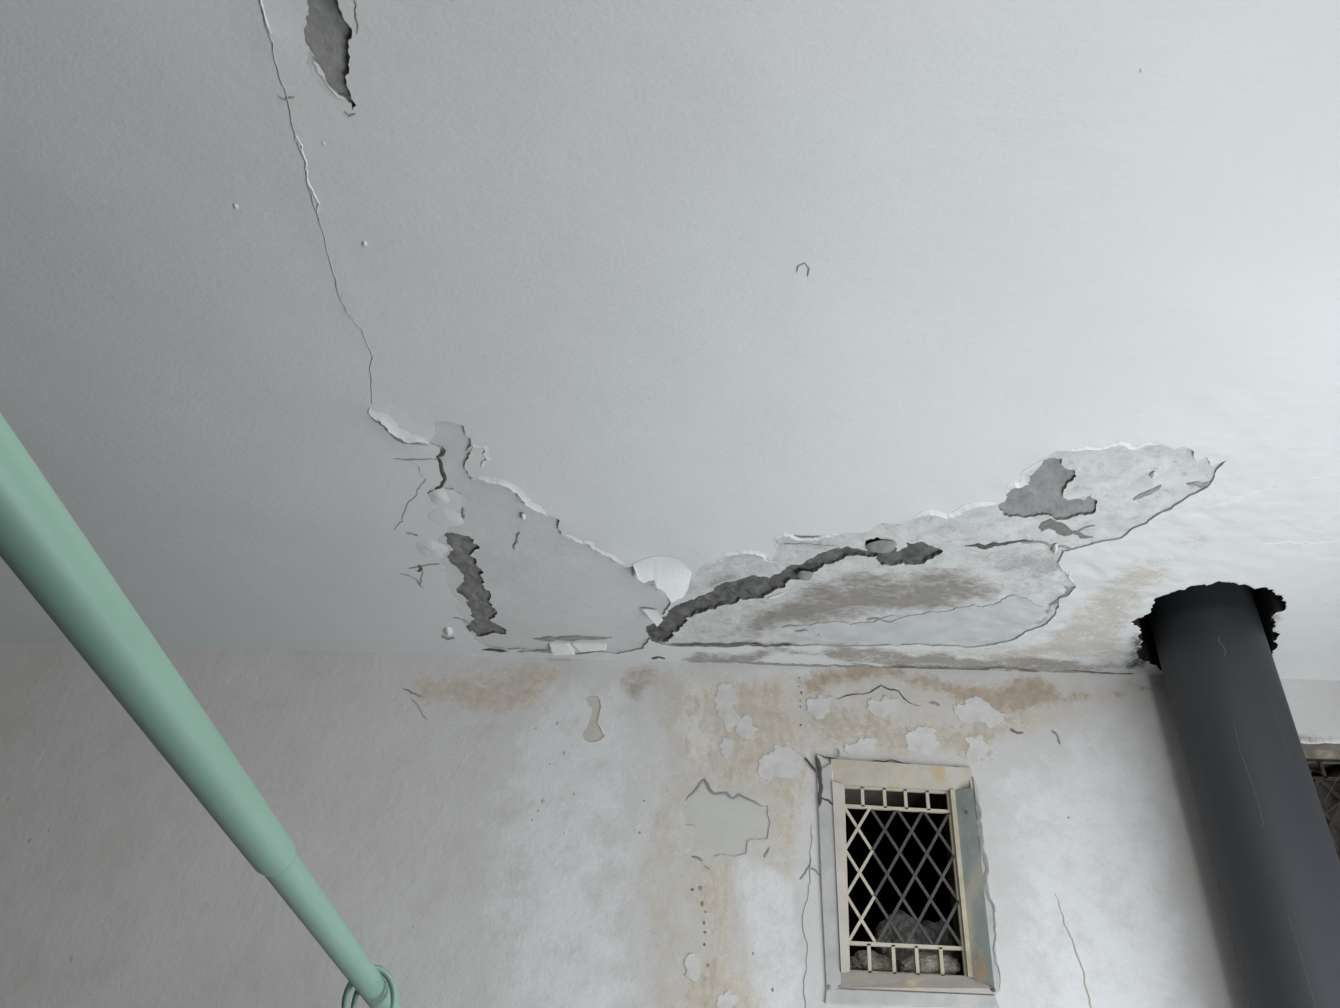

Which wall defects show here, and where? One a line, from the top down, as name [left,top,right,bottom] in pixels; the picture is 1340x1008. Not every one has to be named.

flaking render [304,0,359,117]
crack [259,0,373,395]
crack [395,460,427,529]
crack [400,565,423,588]
peeling [369,407,1225,655]
damp [753,570,997,630]
damp [685,686,794,780]
damp [687,648,798,664]
crack [839,685,940,706]
damp [806,647,1109,755]
crack [799,749,840,1008]
damp [688,958,738,1008]